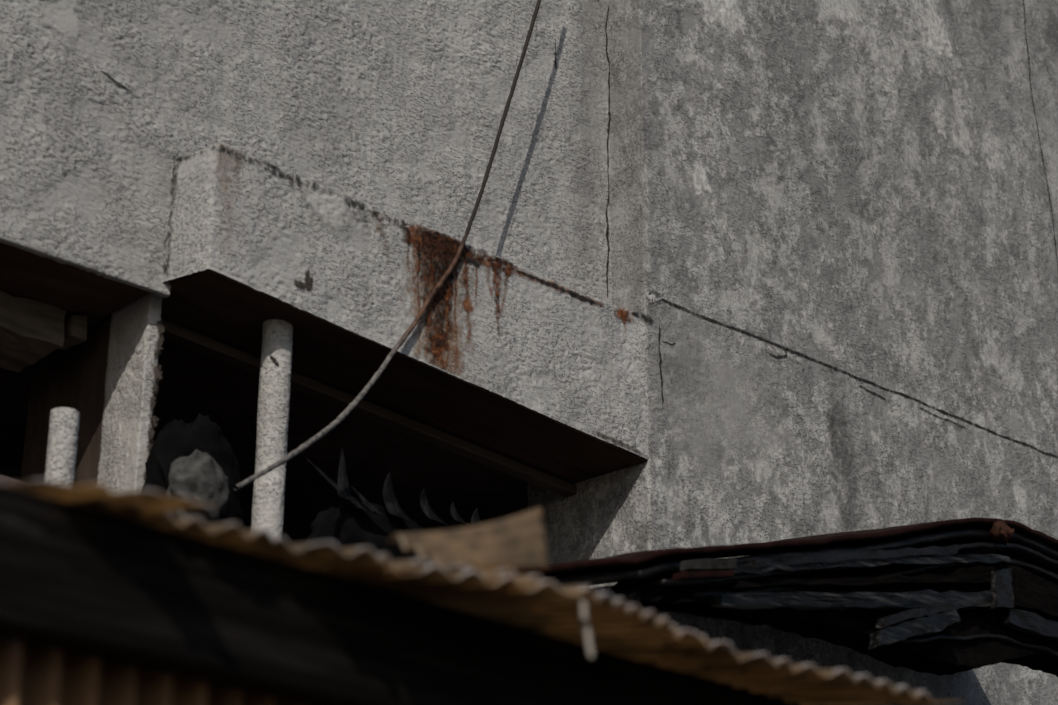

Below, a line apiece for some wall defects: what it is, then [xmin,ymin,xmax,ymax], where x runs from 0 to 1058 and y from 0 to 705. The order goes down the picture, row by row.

crack [516,7,611,306]
crack [1023,0,1058,266]
crack [465,257,480,266]
rust [405,225,603,372]
rust [614,308,631,323]
crack [631,298,1057,457]